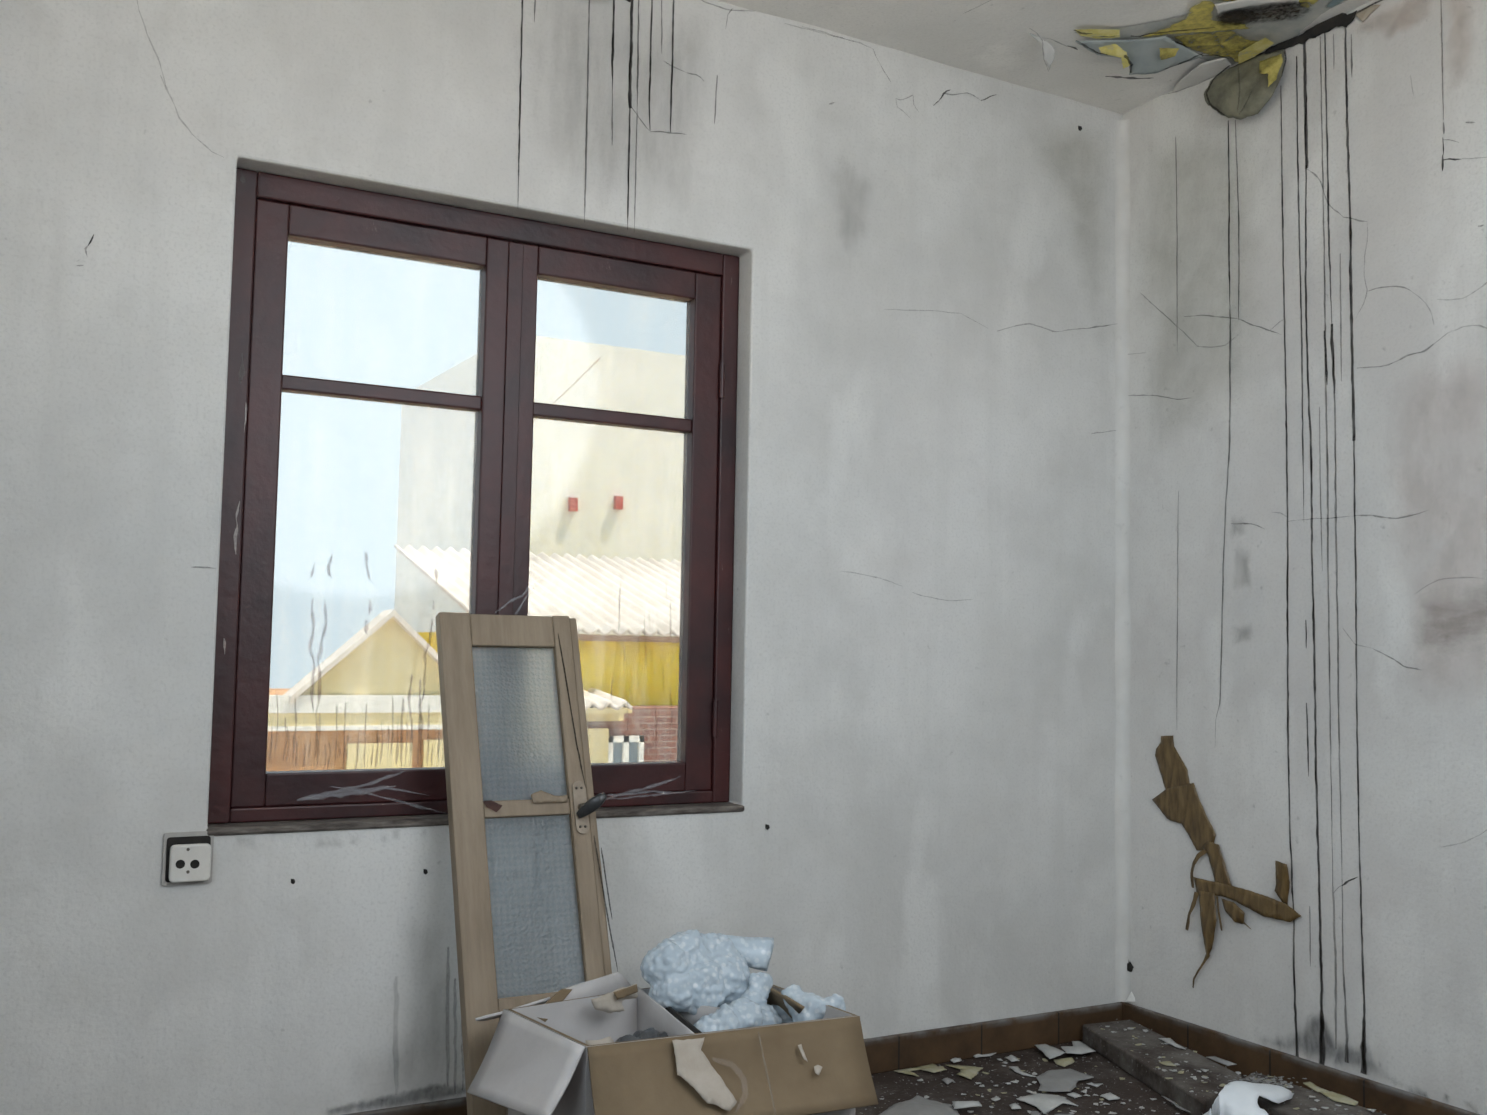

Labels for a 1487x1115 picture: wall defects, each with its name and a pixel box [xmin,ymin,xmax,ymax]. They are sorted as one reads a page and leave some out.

leakage [518,0,535,194]
leakage [611,0,674,230]
peeling [1075,36,1286,120]
spalling [1356,4,1381,22]
leakage [1228,121,1239,405]
leakage [1215,432,1230,733]
leakage [1280,27,1367,1074]